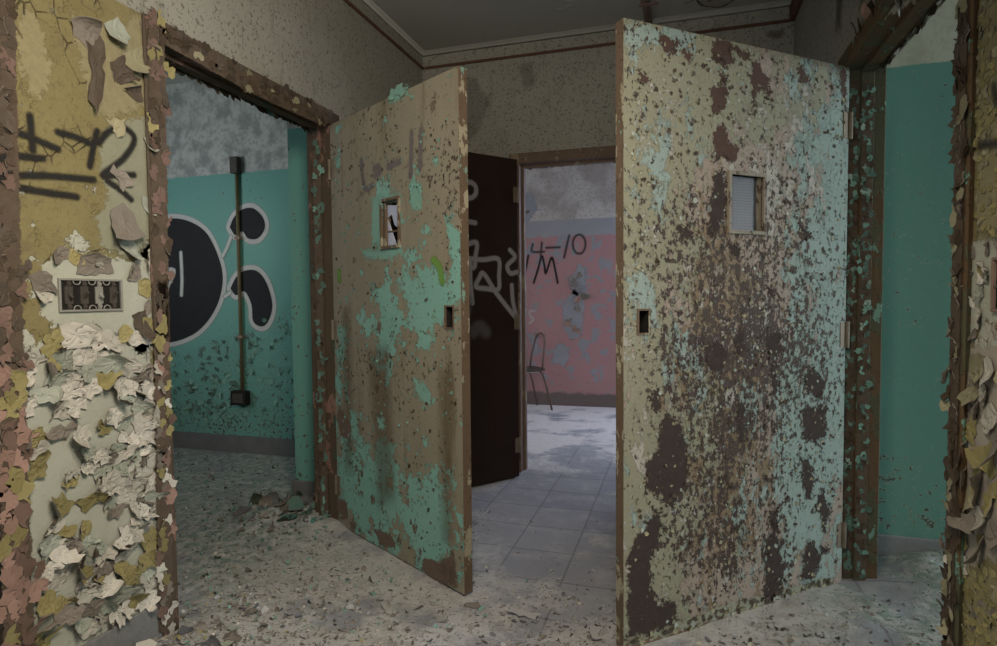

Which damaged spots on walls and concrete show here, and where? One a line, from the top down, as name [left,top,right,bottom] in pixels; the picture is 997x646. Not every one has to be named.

peeling [850,0,916,37]
peeling [388,83,410,106]
peeling [0,0,333,646]
peeling [551,263,590,368]
peeling [624,81,877,646]